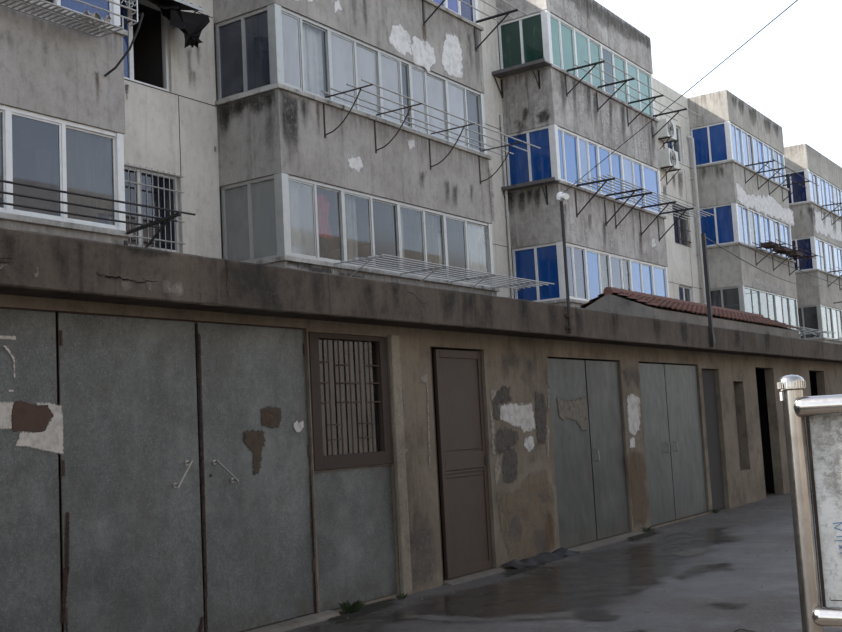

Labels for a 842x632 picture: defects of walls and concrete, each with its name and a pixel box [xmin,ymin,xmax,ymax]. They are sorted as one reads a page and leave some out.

peeling [389,24,463,79]
peeling [348,156,363,172]
crack [97,273,156,283]
peeling [490,386,550,487]
peeling [627,394,641,448]